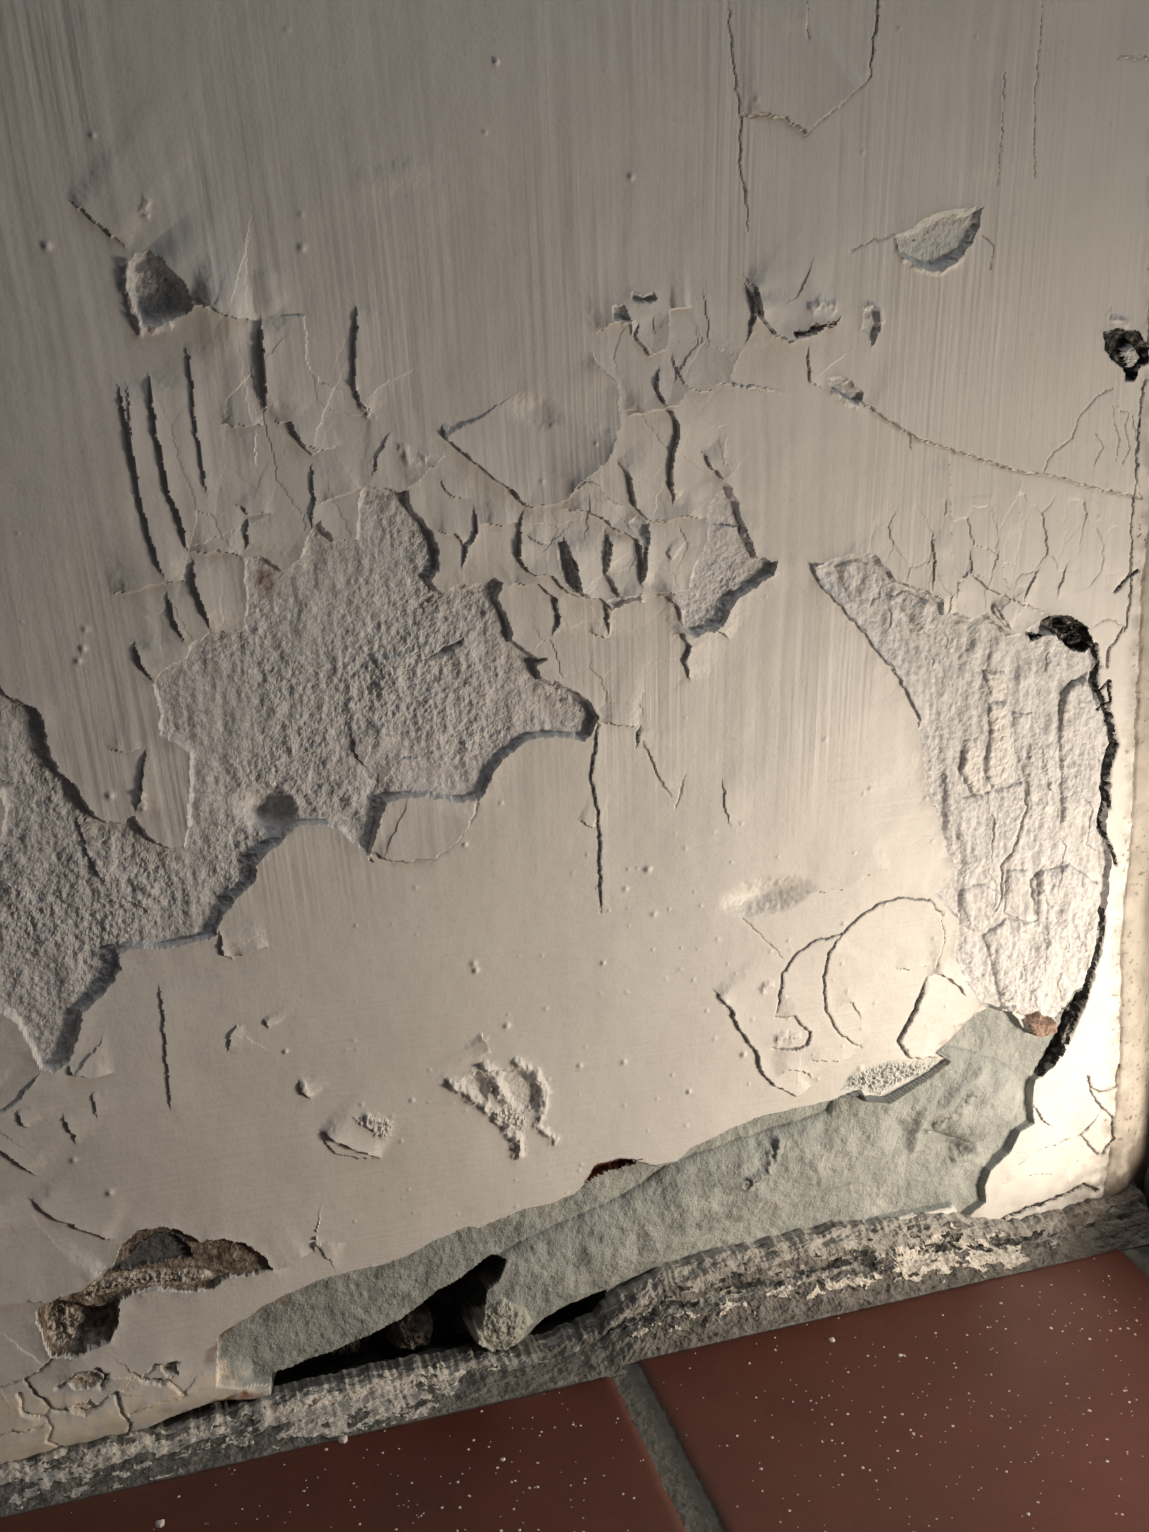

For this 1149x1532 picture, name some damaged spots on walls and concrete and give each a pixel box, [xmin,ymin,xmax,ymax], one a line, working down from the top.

crack [727,0,880,232]
peeling [850,206,995,275]
peeling [793,316,841,338]
spalling [1103,304,1149,381]
crack [856,308,1149,864]
peeling [0,269,778,1130]
spalling [217,489,1125,1393]
crack [742,896,945,1048]
crack [1062,906,1106,1044]
crack [1000,1064,1121,1220]
peeling [36,1226,350,1357]
water stain [0,1360,258,1465]